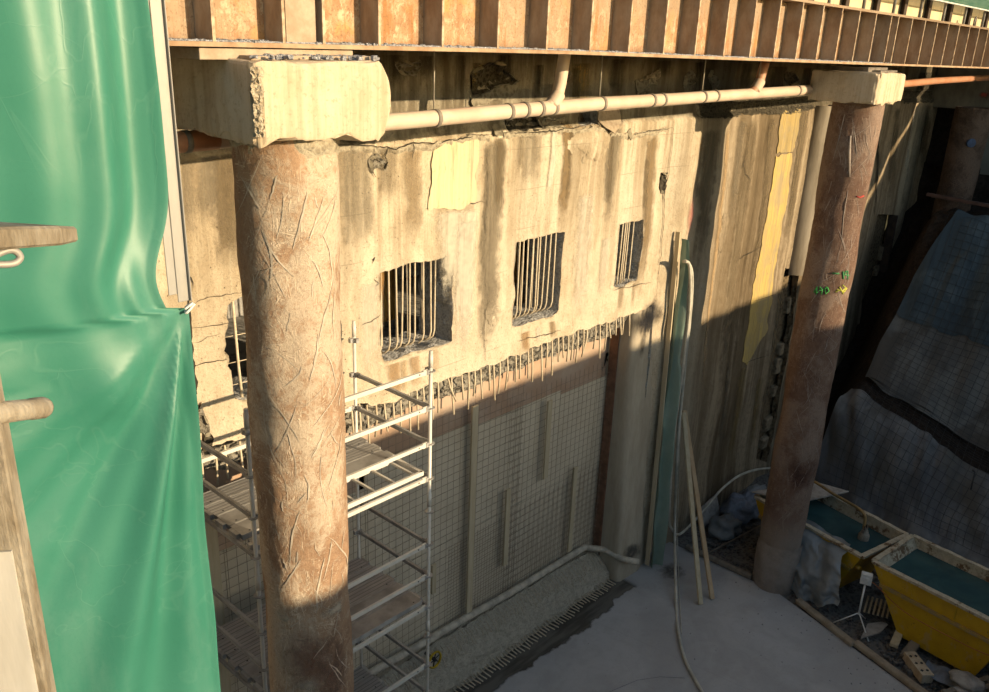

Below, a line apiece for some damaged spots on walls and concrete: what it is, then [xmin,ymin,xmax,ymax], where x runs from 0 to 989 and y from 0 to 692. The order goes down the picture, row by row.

spalling [250,66,267,137]
crack [340,134,491,232]
water stain [440,139,507,327]
spalling [470,61,520,106]
crack [516,126,578,134]
water stain [697,132,729,348]
peeling [683,70,815,365]
water stain [789,111,808,231]
crack [188,277,237,452]
spalling [345,315,628,433]
water stain [638,302,661,351]
spalling [199,408,252,470]